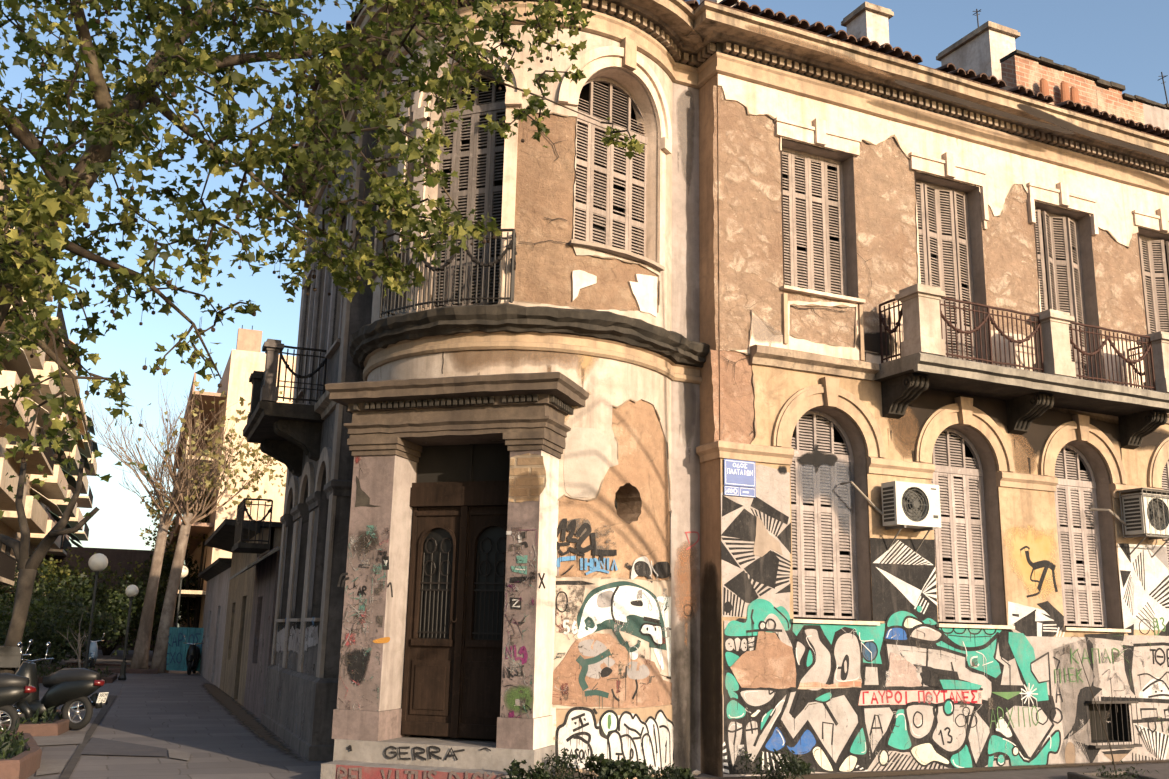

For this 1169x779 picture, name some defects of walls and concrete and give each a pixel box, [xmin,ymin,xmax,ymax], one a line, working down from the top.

peeling [514,112,660,317]
peeling [710,85,918,444]
peeling [980,184,1039,337]
peeling [1090,219,1147,341]
peeling [556,398,671,582]
flaking render [552,633,672,708]